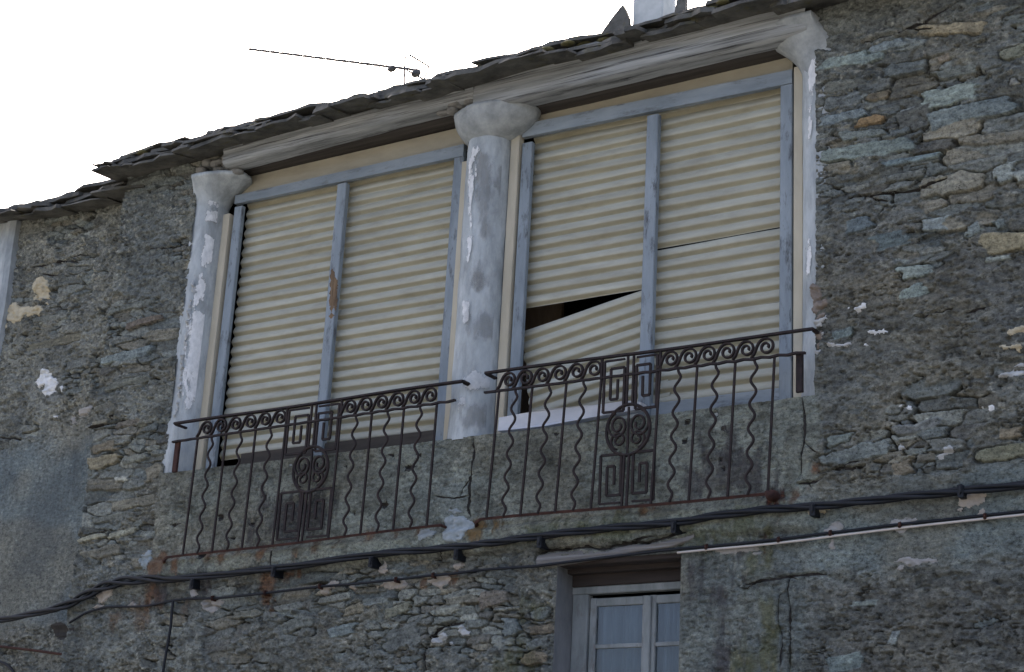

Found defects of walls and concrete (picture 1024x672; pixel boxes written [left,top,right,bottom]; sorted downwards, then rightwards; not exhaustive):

peeling [808,58,817,139]
peeling [205,200,219,223]
peeling [466,145,480,263]
peeling [5,276,51,329]
peeling [173,234,214,417]
peeling [462,300,470,323]
peeling [35,369,63,396]
crack [437,438,476,517]
crack [799,399,865,487]
spalling [418,508,475,543]
crack [741,573,827,668]